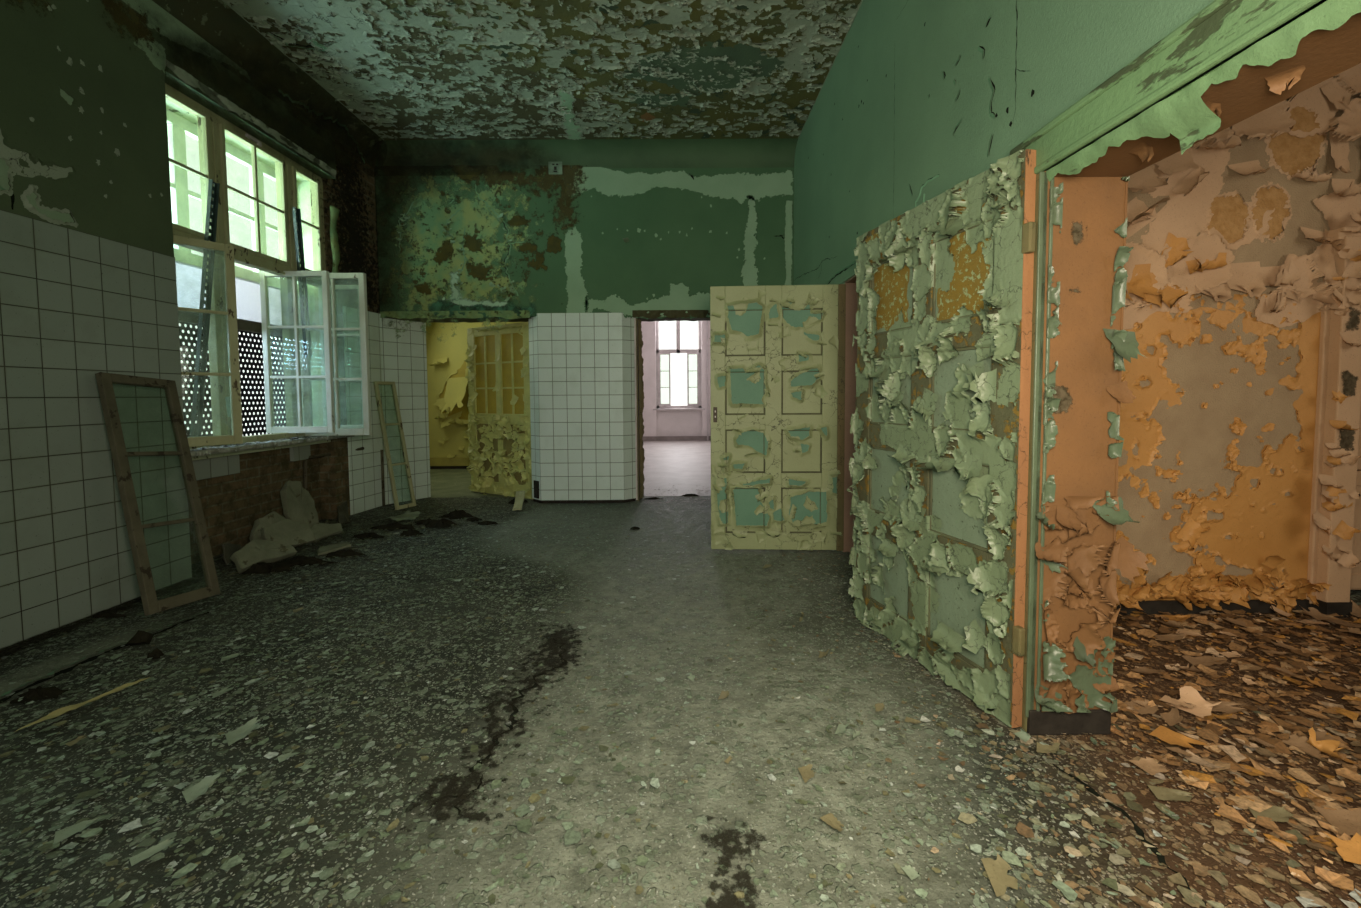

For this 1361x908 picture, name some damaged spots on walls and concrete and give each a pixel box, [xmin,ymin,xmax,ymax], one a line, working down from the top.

peeling [0,125,79,228]
flaking render [119,0,539,565]
peeling [561,150,1063,753]
flaking render [1035,63,1361,730]